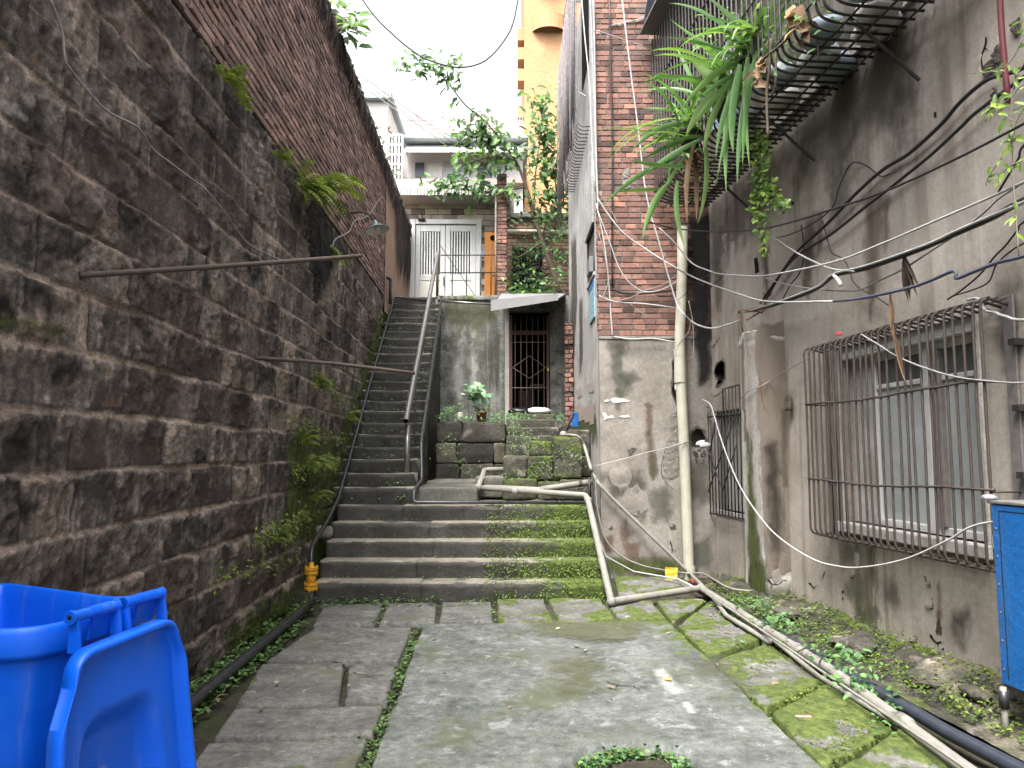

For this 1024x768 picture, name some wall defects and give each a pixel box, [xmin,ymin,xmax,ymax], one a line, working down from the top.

water stain [695,179,770,384]
water stain [611,344,636,407]
spalling [714,359,726,388]
water stain [608,434,656,496]
water stain [749,321,791,596]